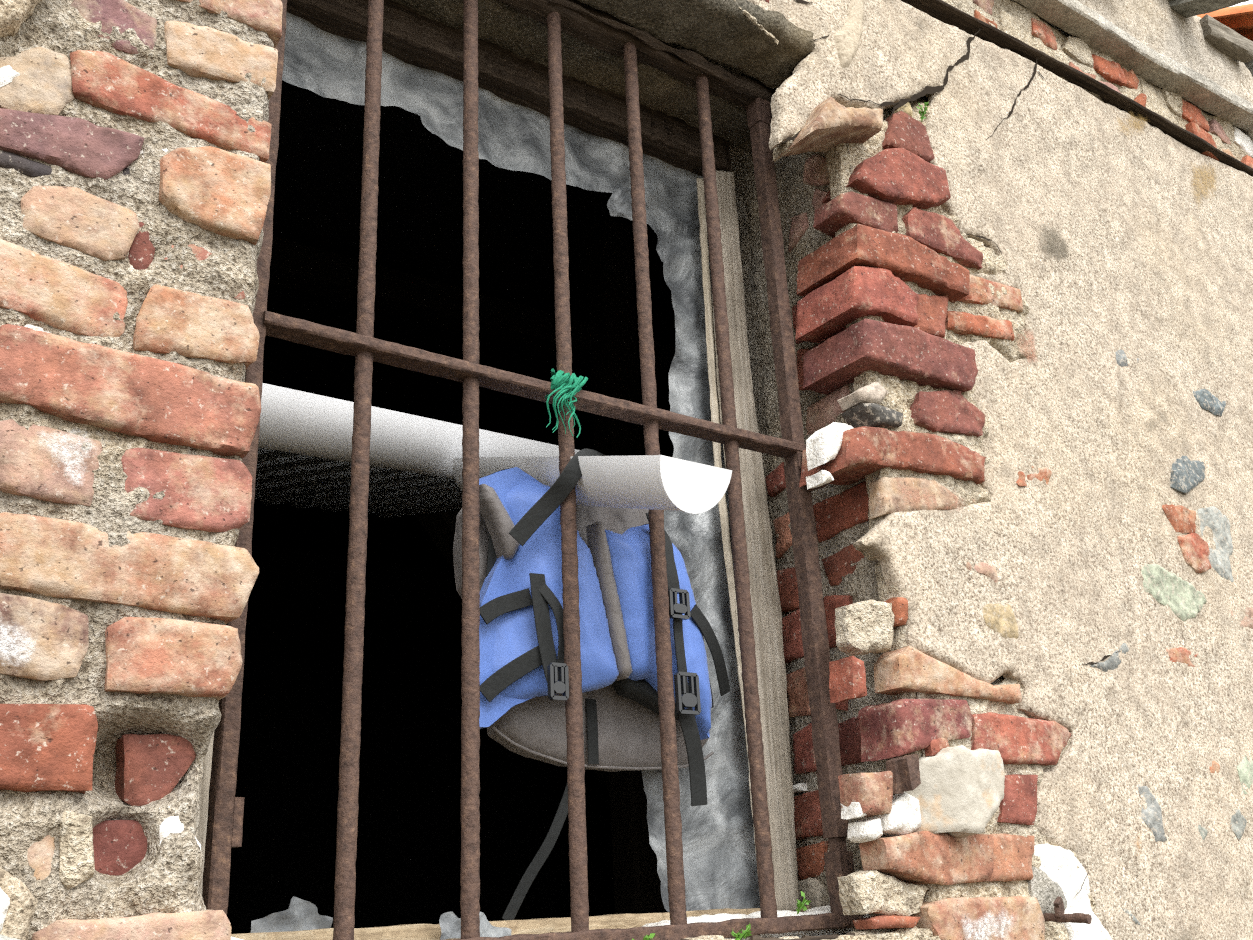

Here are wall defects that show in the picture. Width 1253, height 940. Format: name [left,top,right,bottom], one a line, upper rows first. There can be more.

spalling [733,0,779,45]
crack [986,56,1044,140]
spalling [1115,350,1139,367]
spalling [0,0,283,940]
spalling [765,97,1112,940]
spalling [1090,643,1129,672]